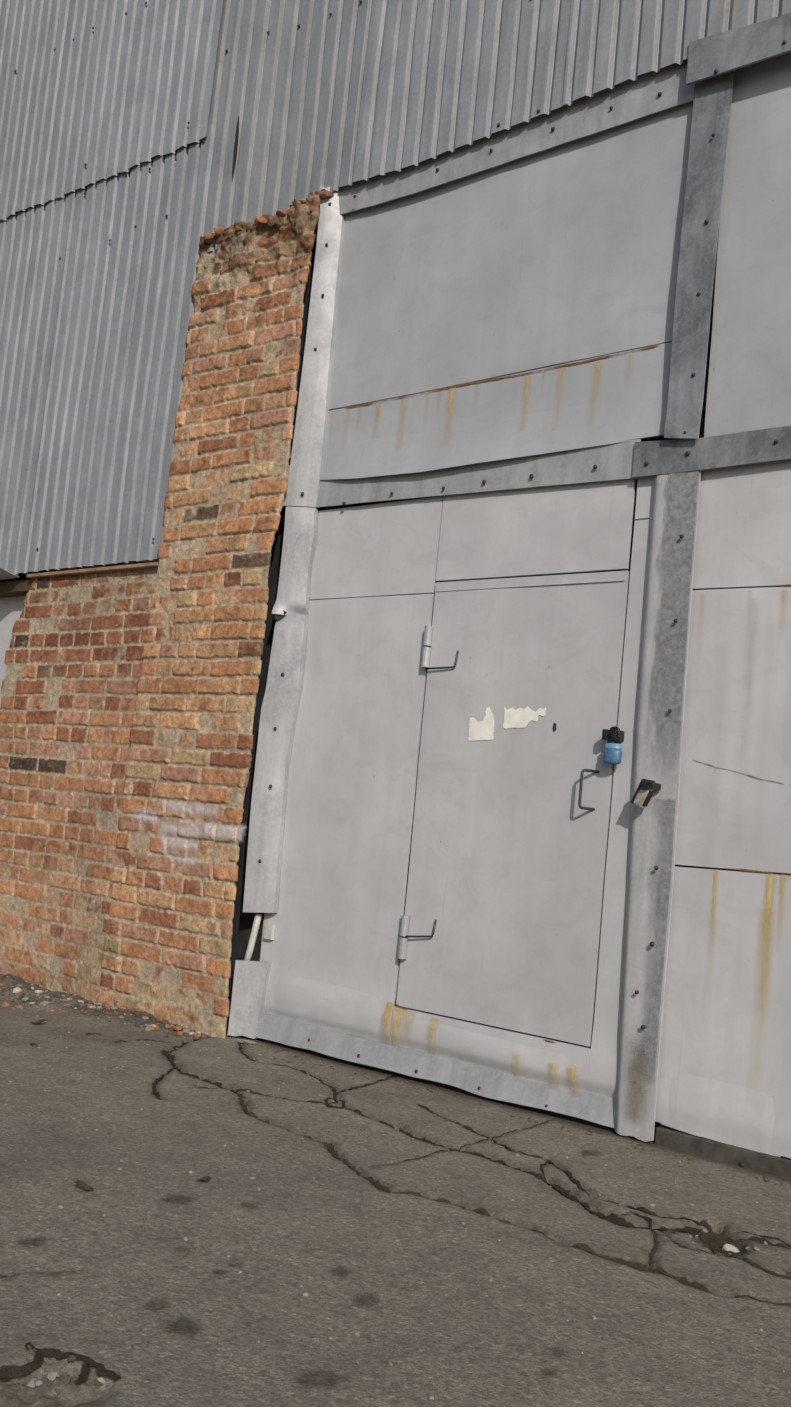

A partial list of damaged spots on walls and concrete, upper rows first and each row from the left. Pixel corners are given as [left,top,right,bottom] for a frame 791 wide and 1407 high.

corrosion [345,345,658,412]
corrosion [737,869,791,927]
corrosion [384,1002,408,1035]